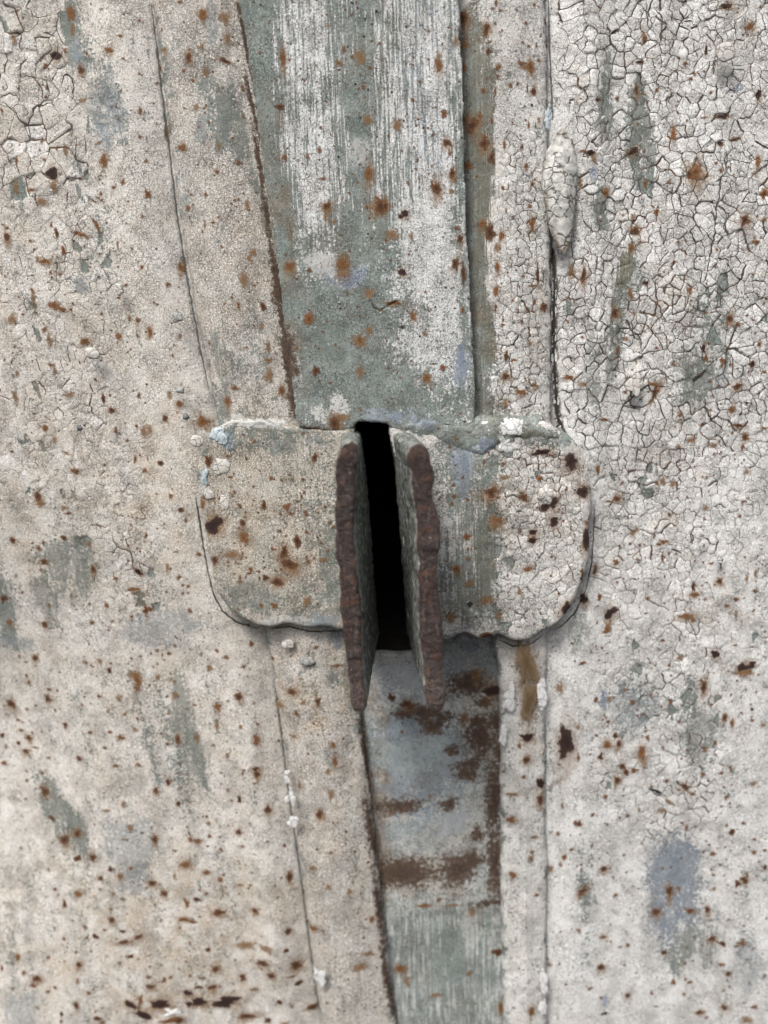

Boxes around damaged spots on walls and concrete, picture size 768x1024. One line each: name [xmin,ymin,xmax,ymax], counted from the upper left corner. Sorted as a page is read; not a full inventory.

crack [0,0,171,643]
rust [436,451,588,587]
crack [481,0,768,859]
rust [0,671,255,1023]
rust [316,664,518,1024]
rust [529,680,767,916]